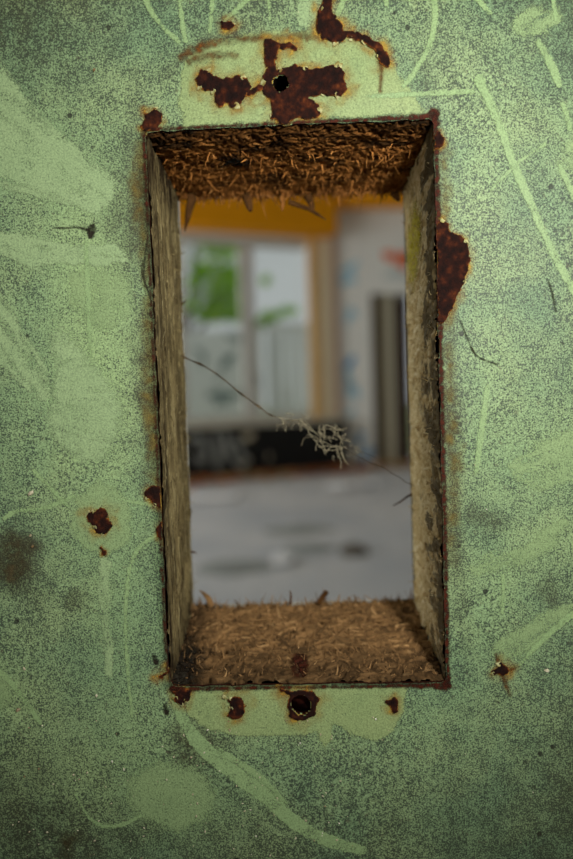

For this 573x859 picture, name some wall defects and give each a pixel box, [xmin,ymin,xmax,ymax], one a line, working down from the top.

corrosion [140,0,472,723]
corrosion [86,507,113,536]
corrosion [490,656,515,693]